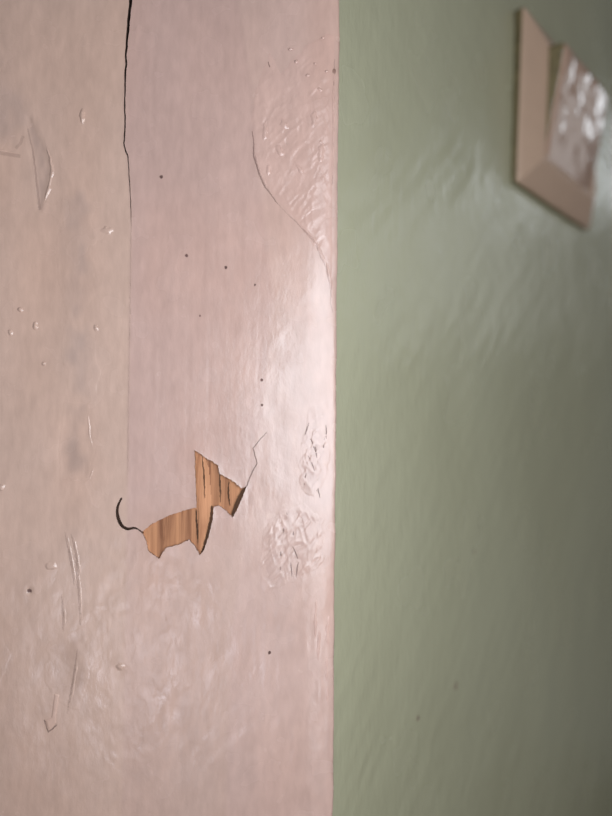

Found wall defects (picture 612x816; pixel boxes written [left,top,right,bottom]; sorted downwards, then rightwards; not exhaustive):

crack [123,0,132,209]
peeling [116,450,246,559]